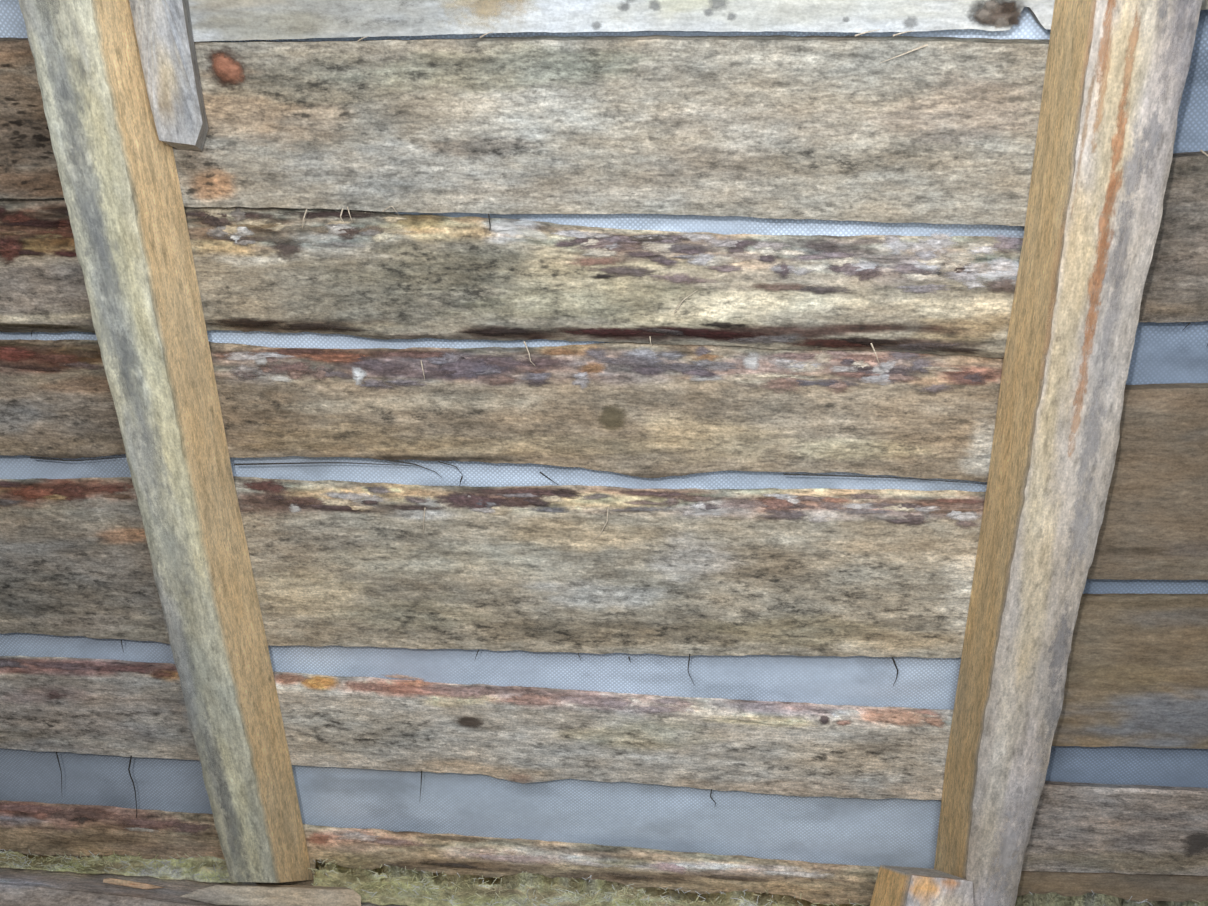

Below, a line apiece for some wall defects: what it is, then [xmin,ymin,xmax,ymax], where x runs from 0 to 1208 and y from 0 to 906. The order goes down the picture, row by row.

leakage [705,0,735,19]